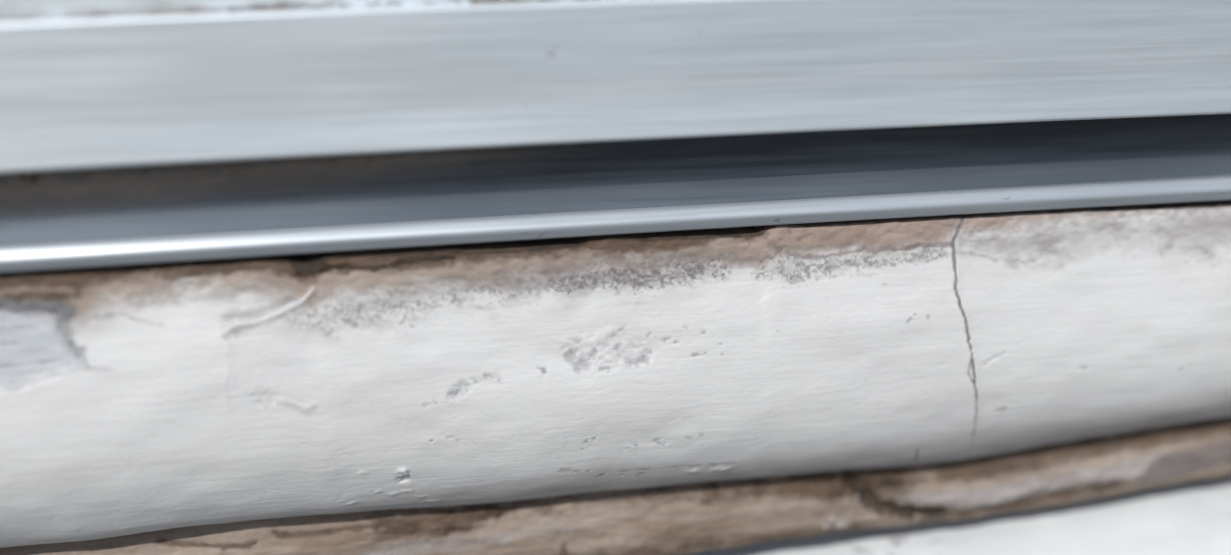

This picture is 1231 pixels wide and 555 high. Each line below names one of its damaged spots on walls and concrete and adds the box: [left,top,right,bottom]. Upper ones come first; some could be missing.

water stain [0,211,1073,319]
crack [951,217,978,435]
water stain [1141,441,1231,482]